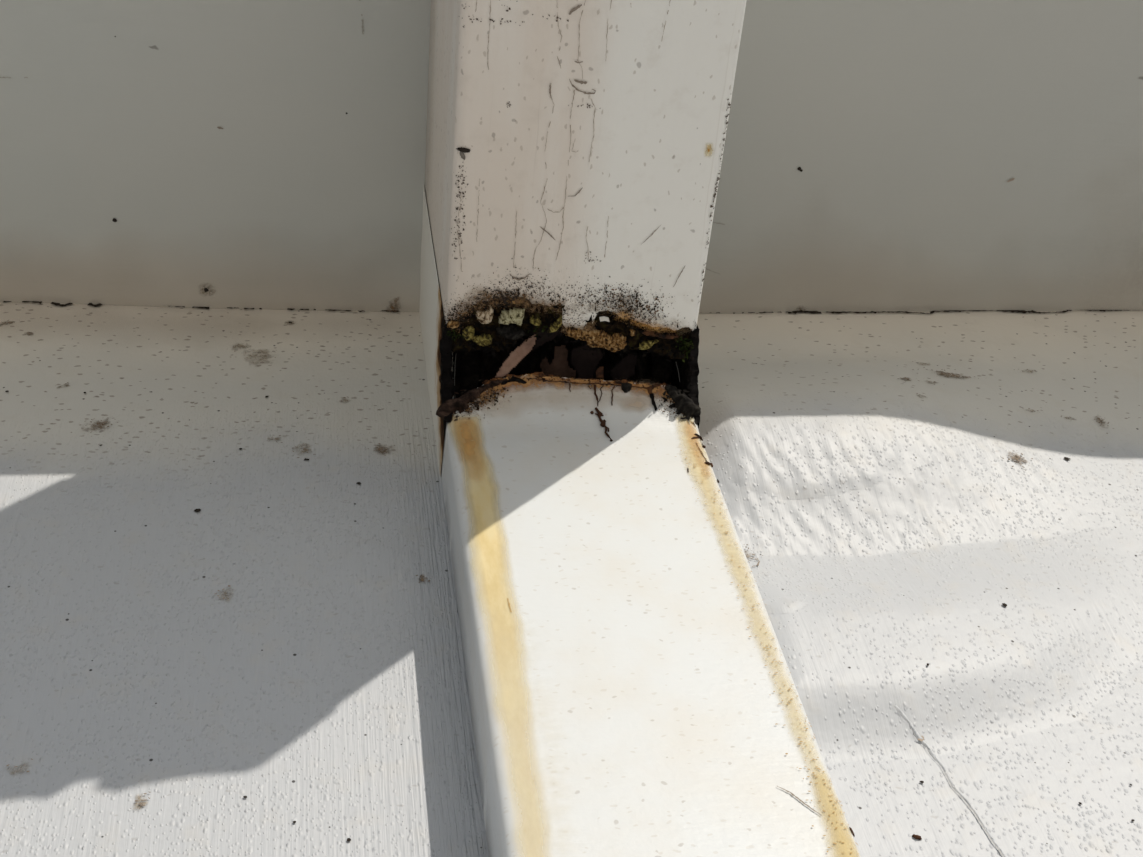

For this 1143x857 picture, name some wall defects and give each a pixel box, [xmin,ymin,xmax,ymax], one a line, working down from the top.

peeling [447,297,679,352]
damp [443,258,694,337]